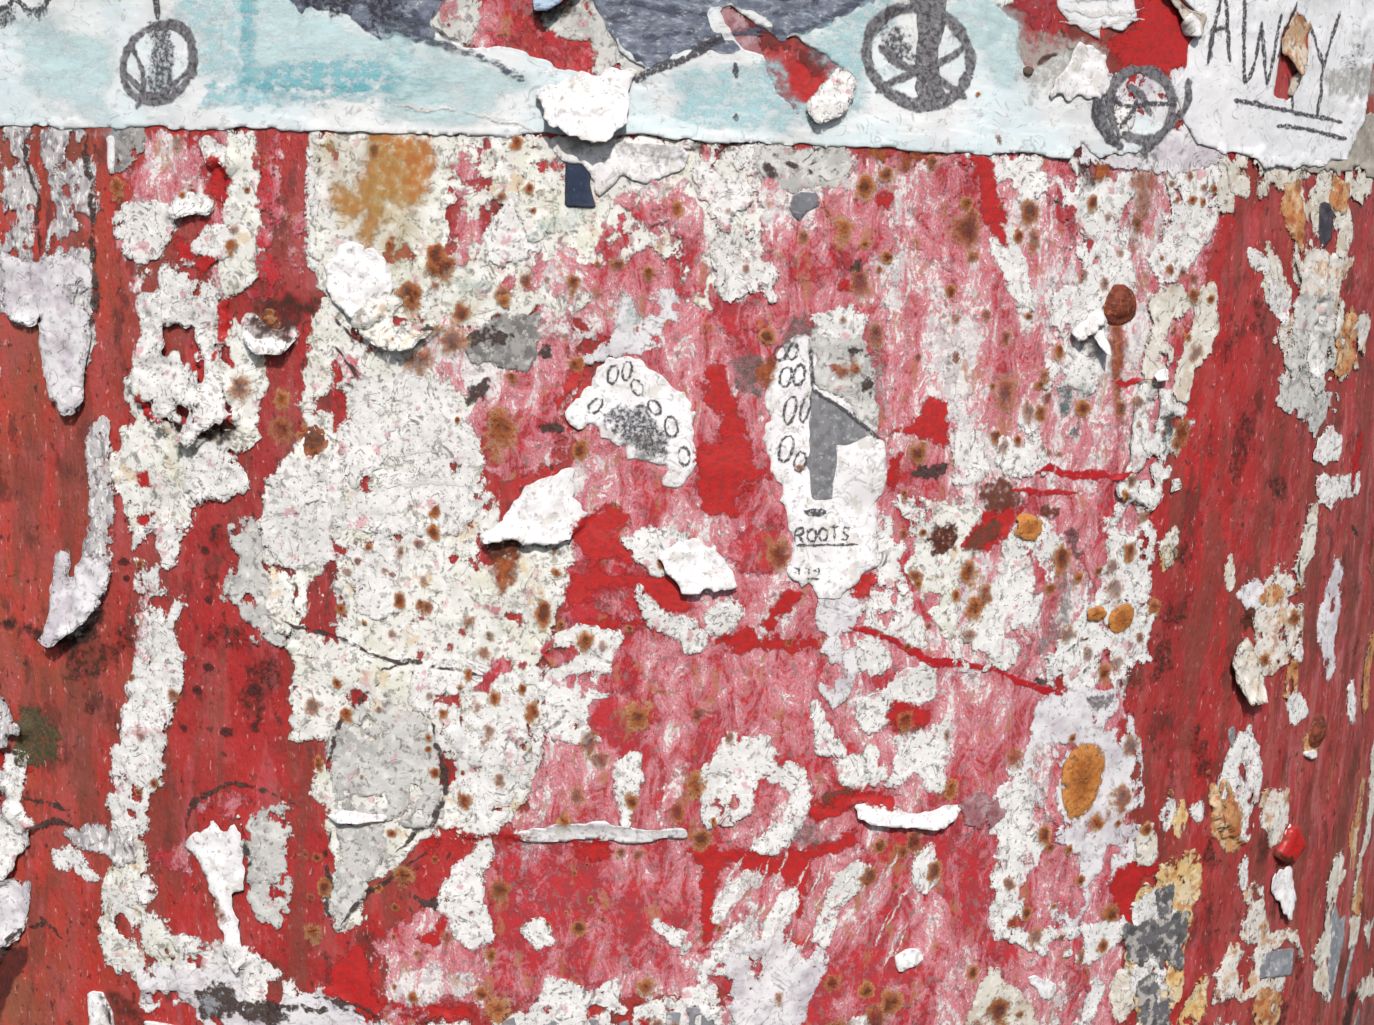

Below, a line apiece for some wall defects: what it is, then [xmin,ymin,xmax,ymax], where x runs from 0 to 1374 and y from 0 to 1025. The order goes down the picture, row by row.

rust [332,133,436,255]
rust [394,243,454,318]
peeling [682,139,959,438]
rust [1013,198,1040,254]
peeling [1216,153,1374,759]
peeling [0,123,322,986]
peeling [523,524,699,745]
rust [900,522,993,640]
rust [1042,542,1161,643]
peeling [612,731,814,856]
rust [1062,734,1132,832]
peeling [1108,724,1374,1025]